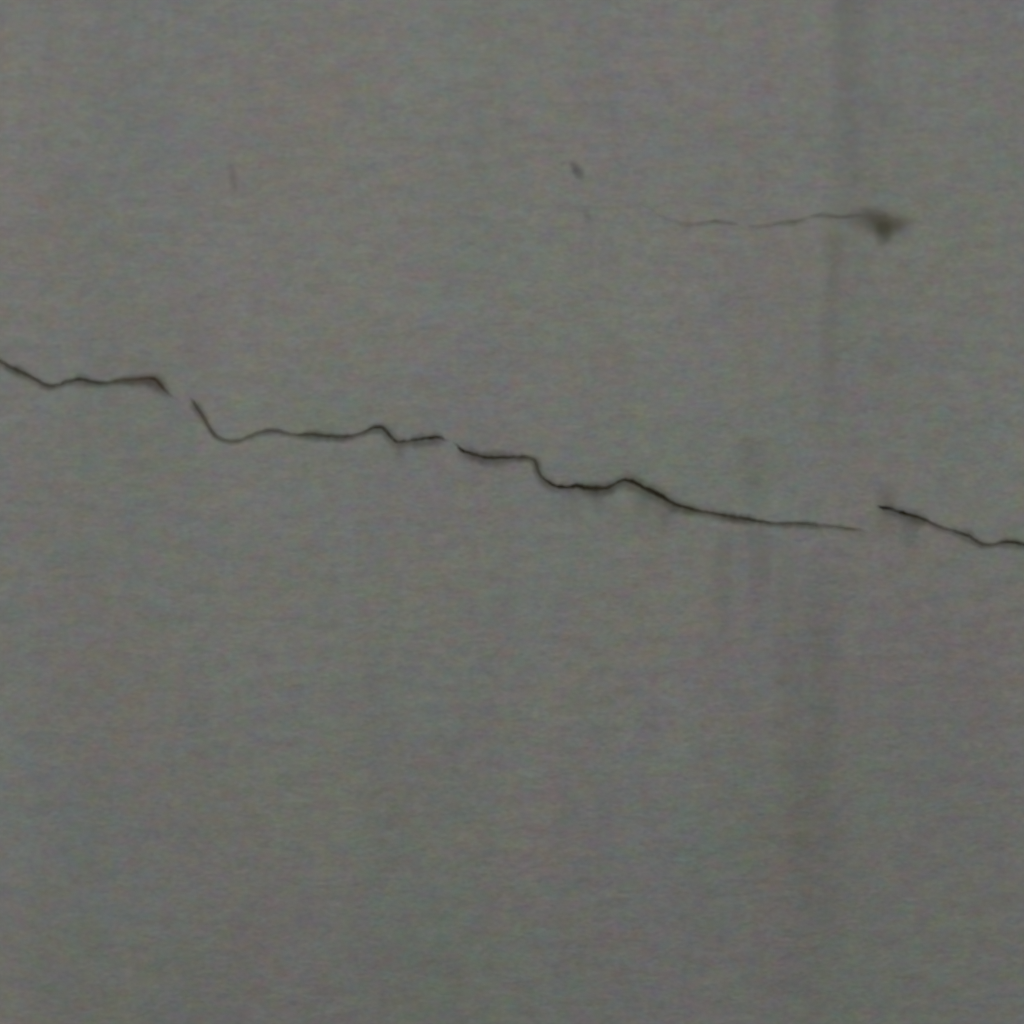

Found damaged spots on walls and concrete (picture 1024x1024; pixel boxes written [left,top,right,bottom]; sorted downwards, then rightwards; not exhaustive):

crack [0,360,863,531]
crack [877,506,1024,545]